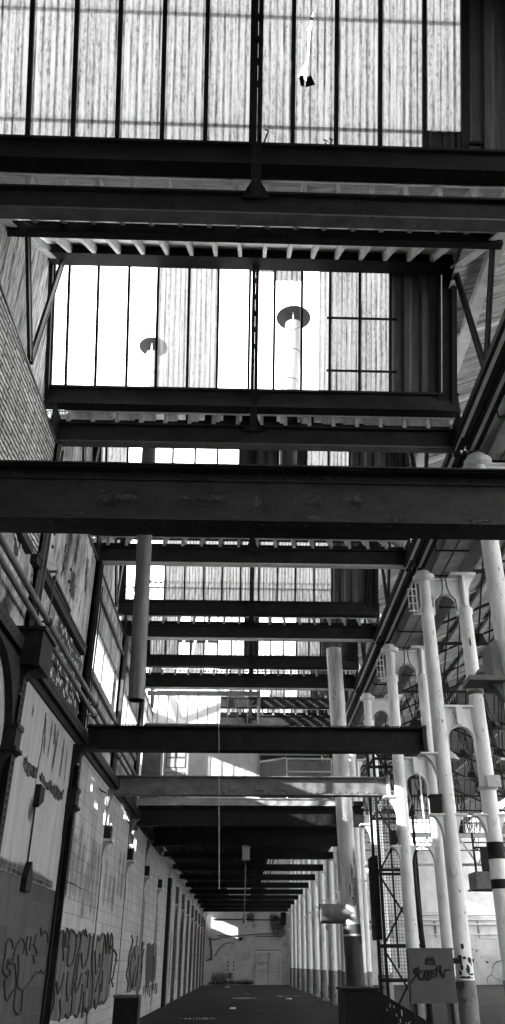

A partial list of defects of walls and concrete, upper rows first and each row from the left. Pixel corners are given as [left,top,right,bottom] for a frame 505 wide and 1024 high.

peeling [458,943,488,979]